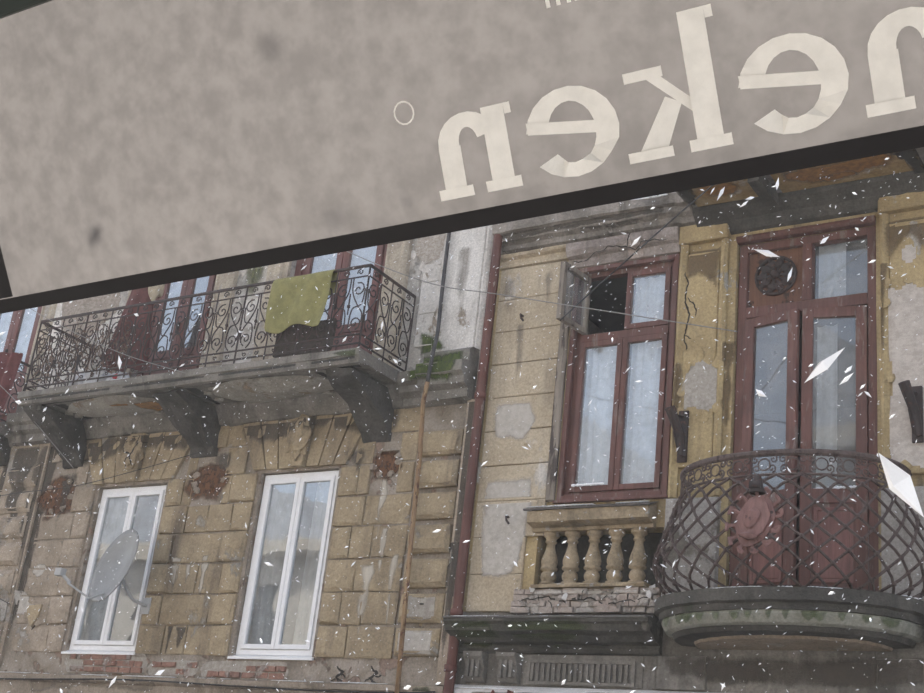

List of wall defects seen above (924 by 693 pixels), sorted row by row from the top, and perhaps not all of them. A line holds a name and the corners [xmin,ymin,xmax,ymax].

peeling [902,244,916,263]
crack [684,272,697,350]
peeling [677,349,721,423]
peeling [879,274,924,469]
peeling [479,473,542,582]
peeling [529,584,655,601]
flaking render [64,653,289,680]